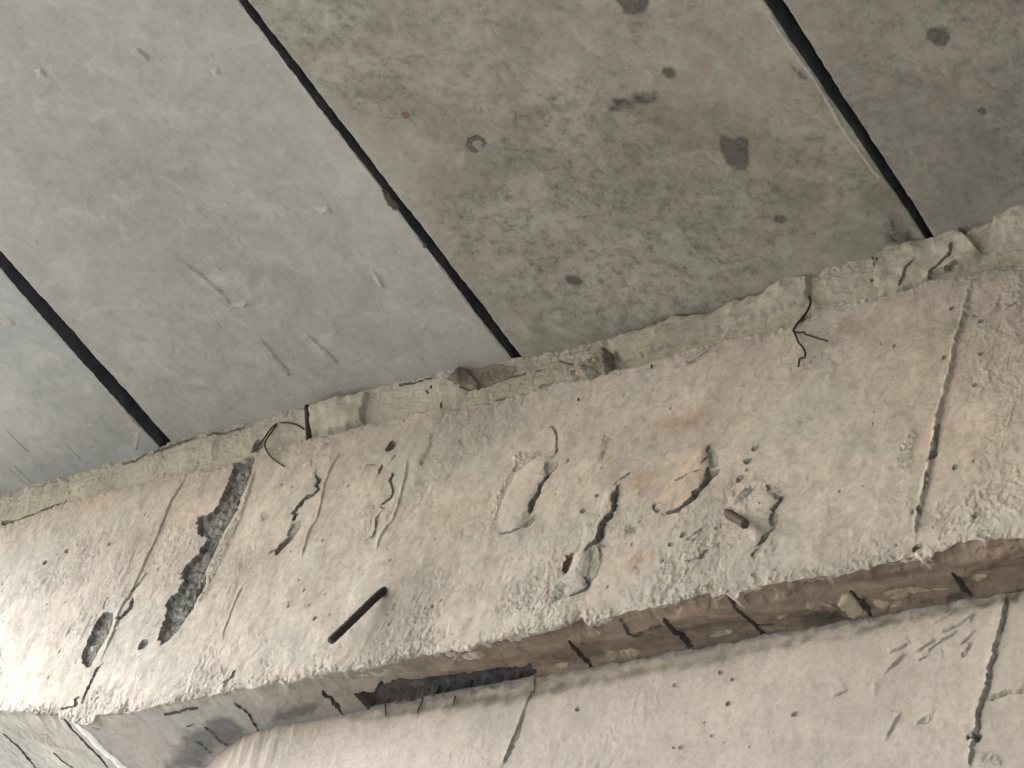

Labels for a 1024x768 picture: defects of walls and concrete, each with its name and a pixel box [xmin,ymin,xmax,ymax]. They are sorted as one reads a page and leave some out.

spalling [157,456,255,646]
crack [267,459,321,555]
crack [366,464,394,538]
crack [499,426,558,534]
crack [584,472,630,562]
crack [652,445,721,515]
crack [750,490,783,558]
spalling [81,612,113,668]
crack [966,596,1023,764]